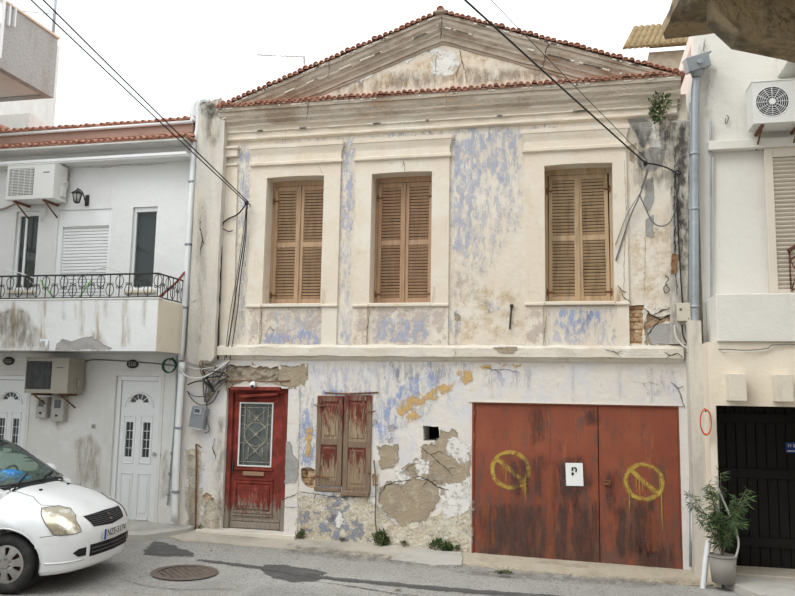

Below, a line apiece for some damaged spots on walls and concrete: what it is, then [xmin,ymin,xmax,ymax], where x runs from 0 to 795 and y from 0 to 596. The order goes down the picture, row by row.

peeling [401,47,460,78]
peeling [451,128,520,258]
flaking render [55,336,112,350]
peeling [373,308,461,344]
peeling [553,310,613,344]
flaking render [629,305,685,346]
peeling [186,450,222,529]
peeling [225,362,545,558]
peeling [556,458,598,562]
peeling [607,475,671,567]